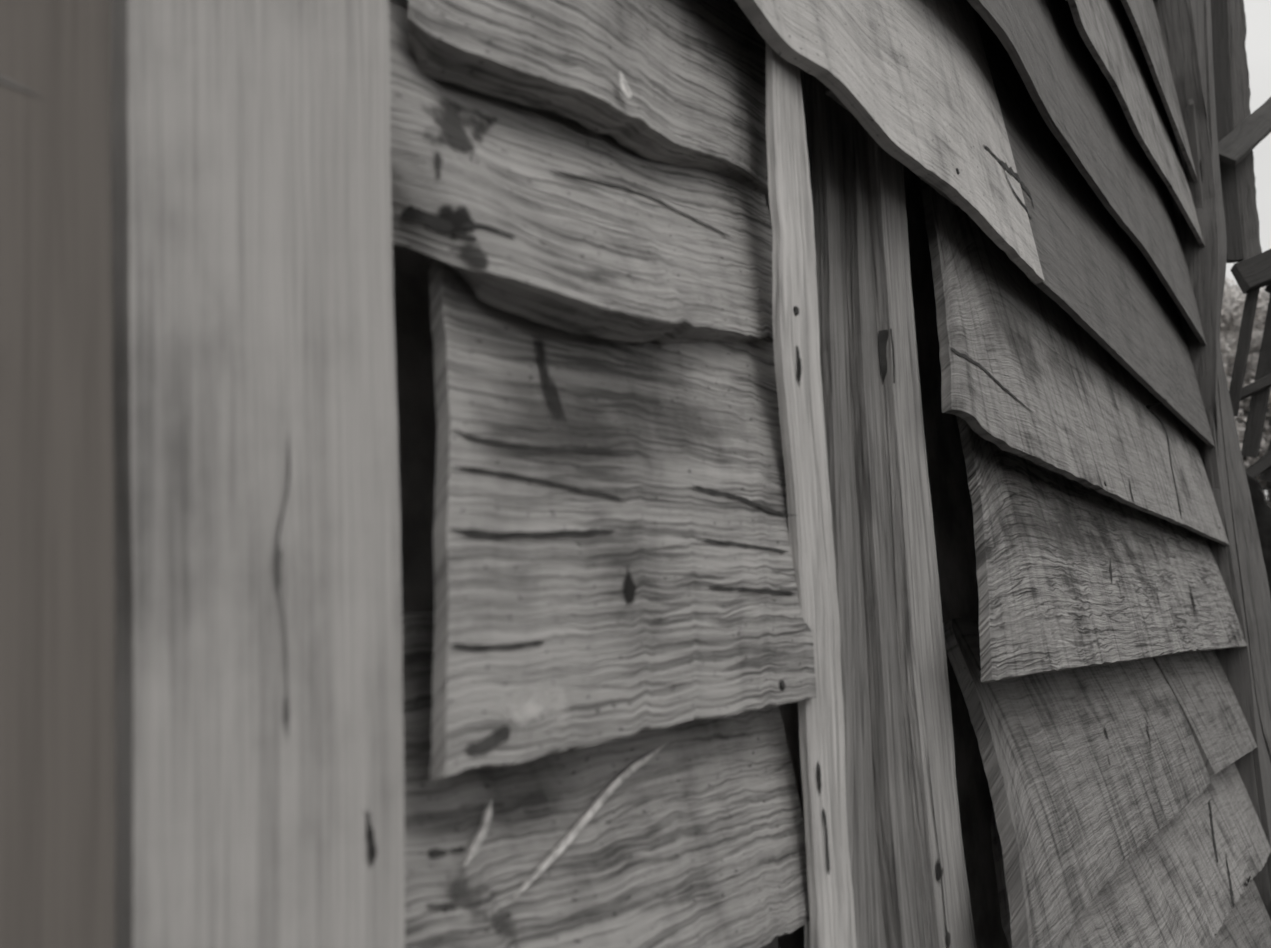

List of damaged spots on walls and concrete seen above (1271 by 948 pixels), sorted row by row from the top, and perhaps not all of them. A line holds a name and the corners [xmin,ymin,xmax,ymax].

crack [275,432,290,725]